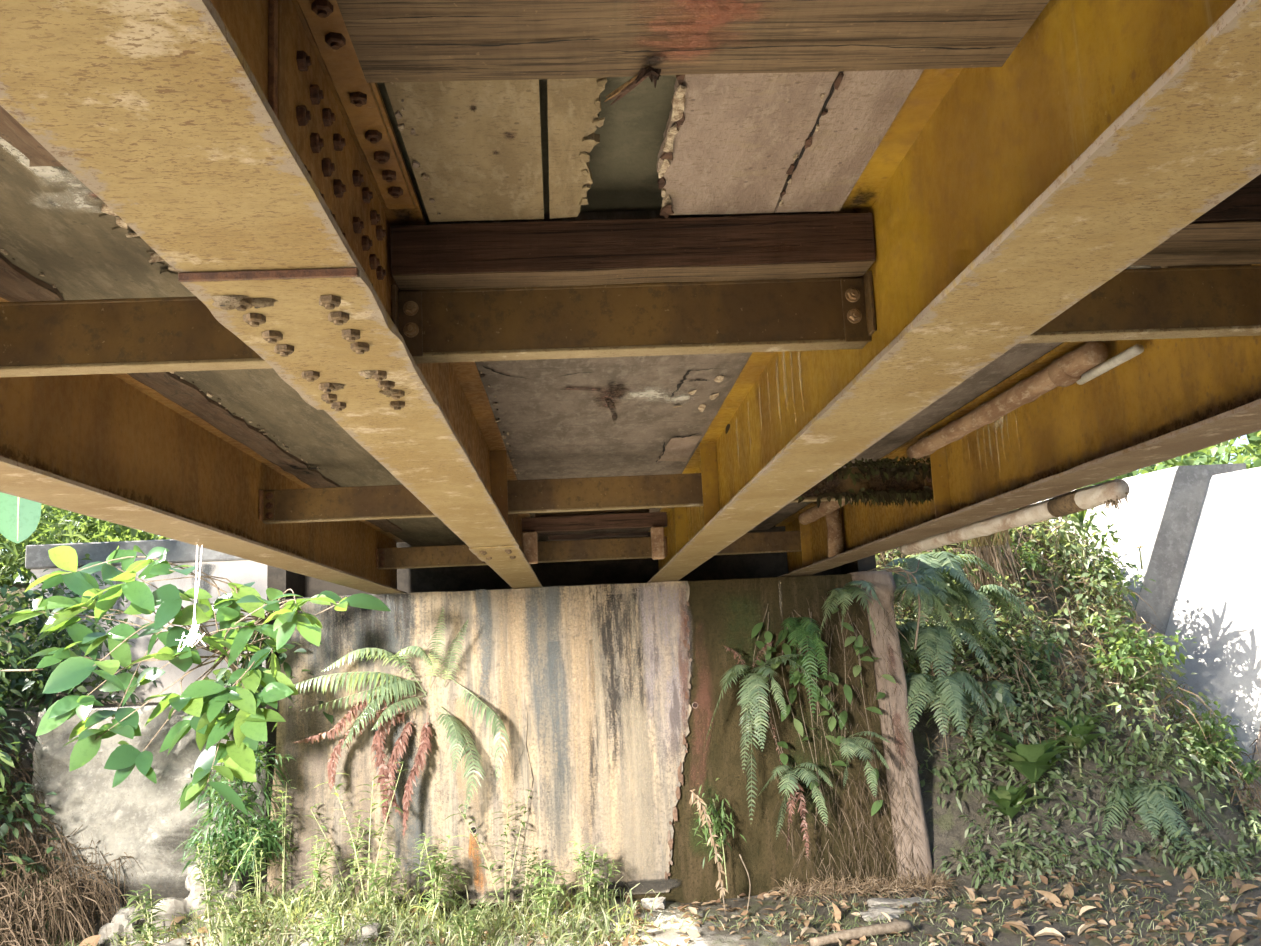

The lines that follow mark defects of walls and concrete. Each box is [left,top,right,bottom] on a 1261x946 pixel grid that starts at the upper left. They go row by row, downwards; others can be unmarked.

damp [0,137,99,211]
peeling [657,74,687,218]
crack [357,16,1020,211]
spalling [656,433,702,462]
damp [285,704,325,884]
damp [340,584,689,905]